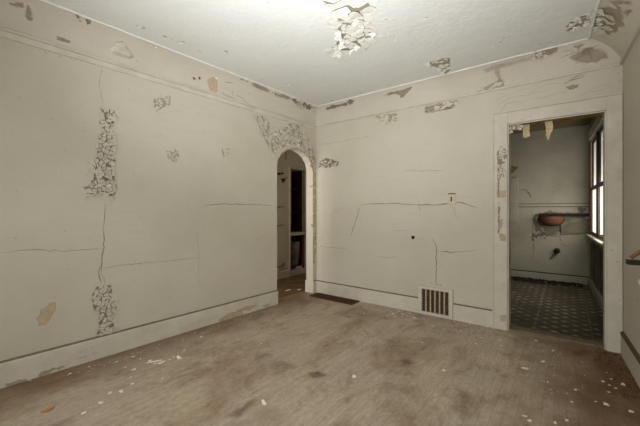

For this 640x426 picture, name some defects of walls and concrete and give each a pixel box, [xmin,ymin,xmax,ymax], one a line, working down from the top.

peeling [315,0,398,59]
peeling [566,3,618,39]
peeling [425,58,455,76]
flaking render [570,45,607,62]
peeling [422,100,461,113]
peeling [545,121,553,140]
peeling [79,102,121,204]
peeling [497,146,518,178]
peeling [254,113,339,263]
peeling [87,284,122,336]